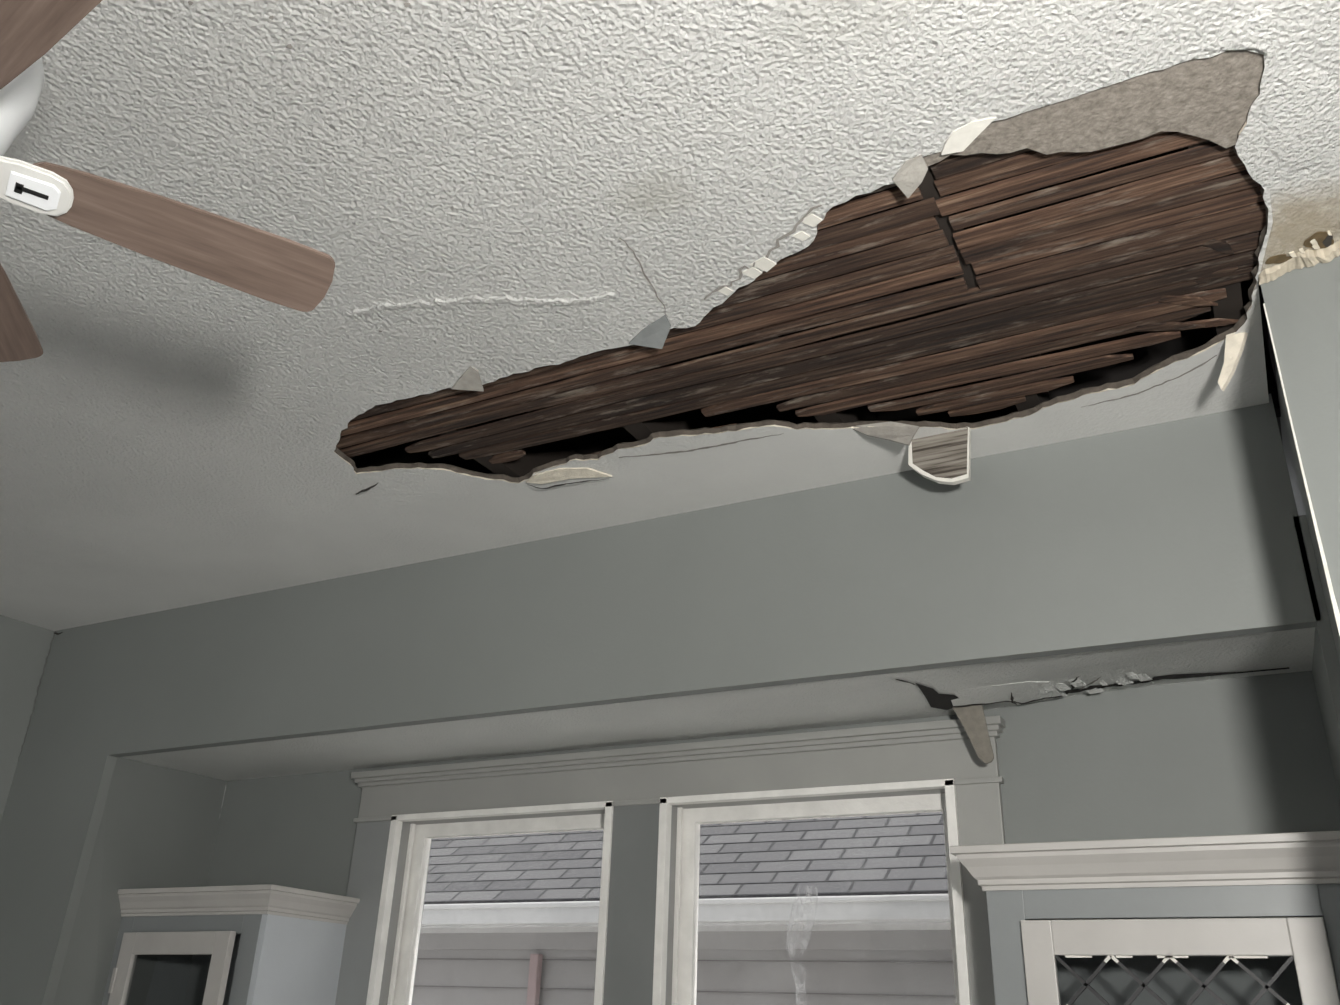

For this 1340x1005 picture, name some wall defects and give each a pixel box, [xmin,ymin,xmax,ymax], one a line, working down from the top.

spalling [892,8,1272,198]
crack [619,238,668,317]
crack [704,205,822,300]
crack [1037,667,1289,698]